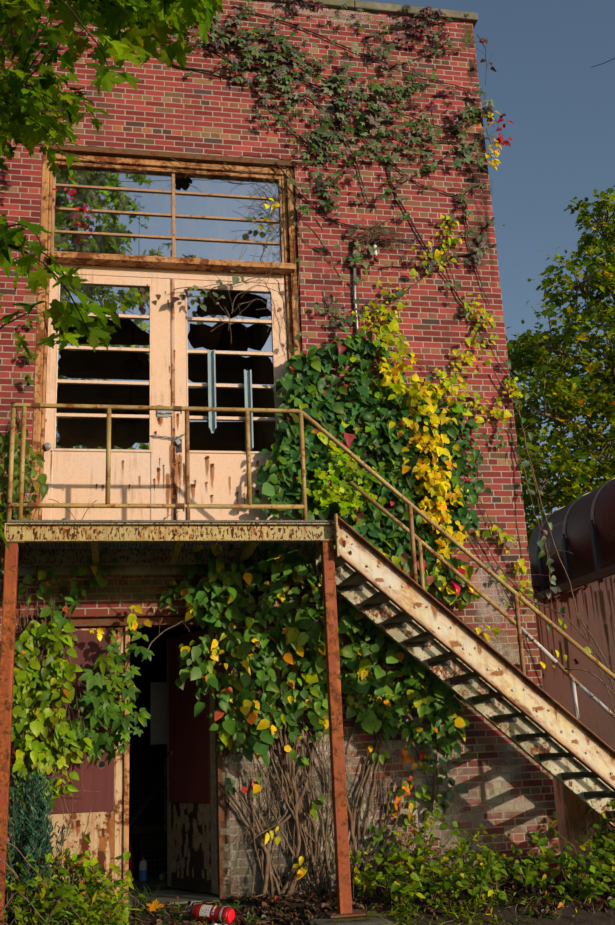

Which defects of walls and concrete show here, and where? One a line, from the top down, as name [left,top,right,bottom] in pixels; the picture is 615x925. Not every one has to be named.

corrosion [112,413,214,539]
corrosion [19,527,99,540]
corrosion [219,527,320,539]
damp [551,638,571,684]
corrosion [535,577,615,678]
damp [594,590,612,672]
peeling [170,803,212,881]